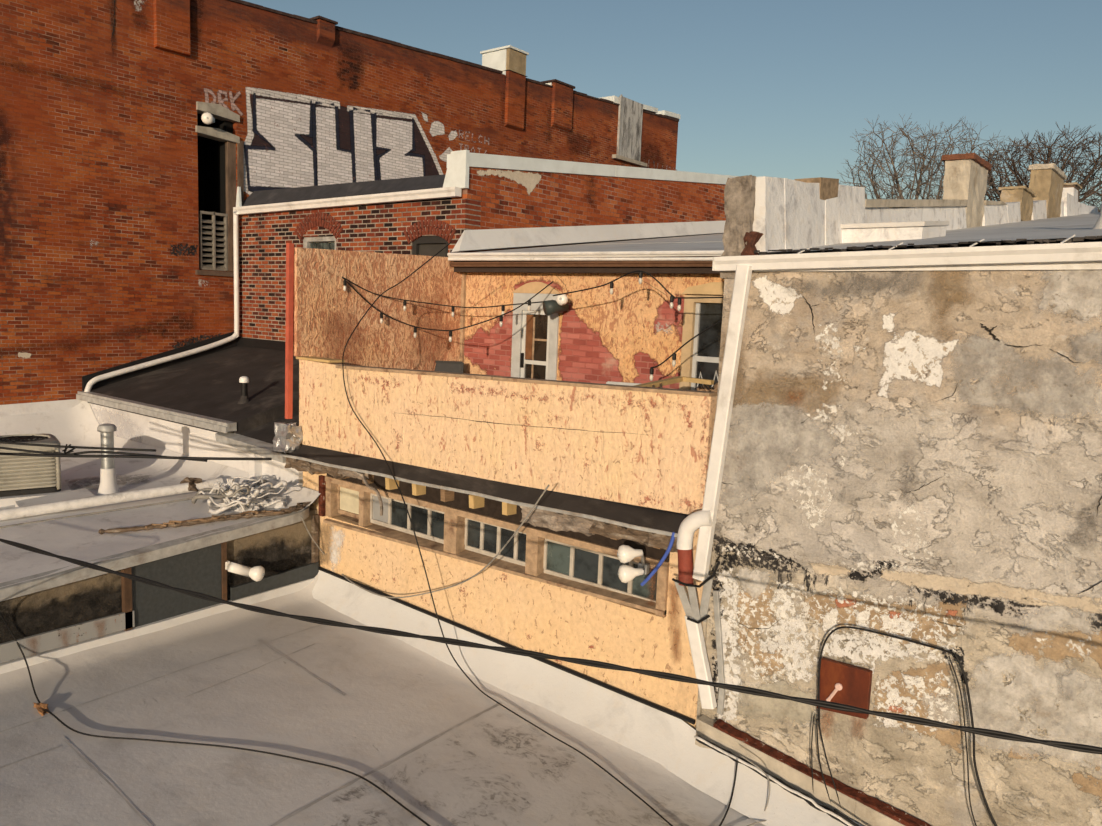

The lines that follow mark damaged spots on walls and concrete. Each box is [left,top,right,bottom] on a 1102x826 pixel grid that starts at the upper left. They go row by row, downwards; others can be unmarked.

peeling [752,274,803,316]
spalling [451,310,568,401]
spalling [514,278,684,389]
peeling [877,312,959,398]
crack [980,323,1084,363]
water stain [848,561,899,583]
mould [0,587,122,644]
water stain [908,585,1042,616]
water stain [1088,612,1102,630]
spalling [1071,759,1102,801]